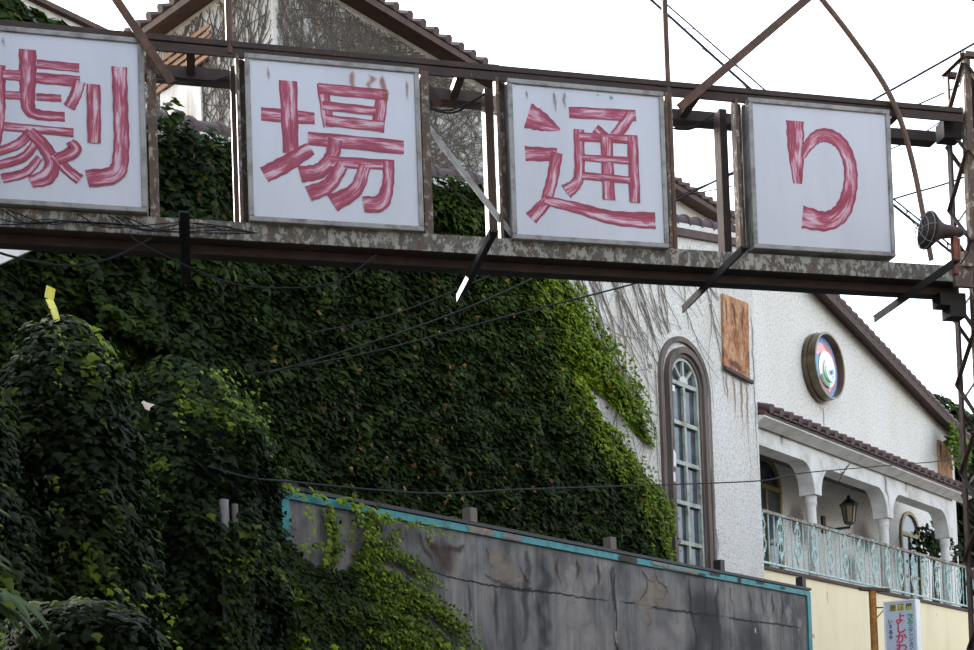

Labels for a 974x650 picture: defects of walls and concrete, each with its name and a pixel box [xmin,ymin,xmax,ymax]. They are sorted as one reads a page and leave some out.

damp [420,534,464,570]
damp [487,557,558,611]
crack [427,568,800,650]